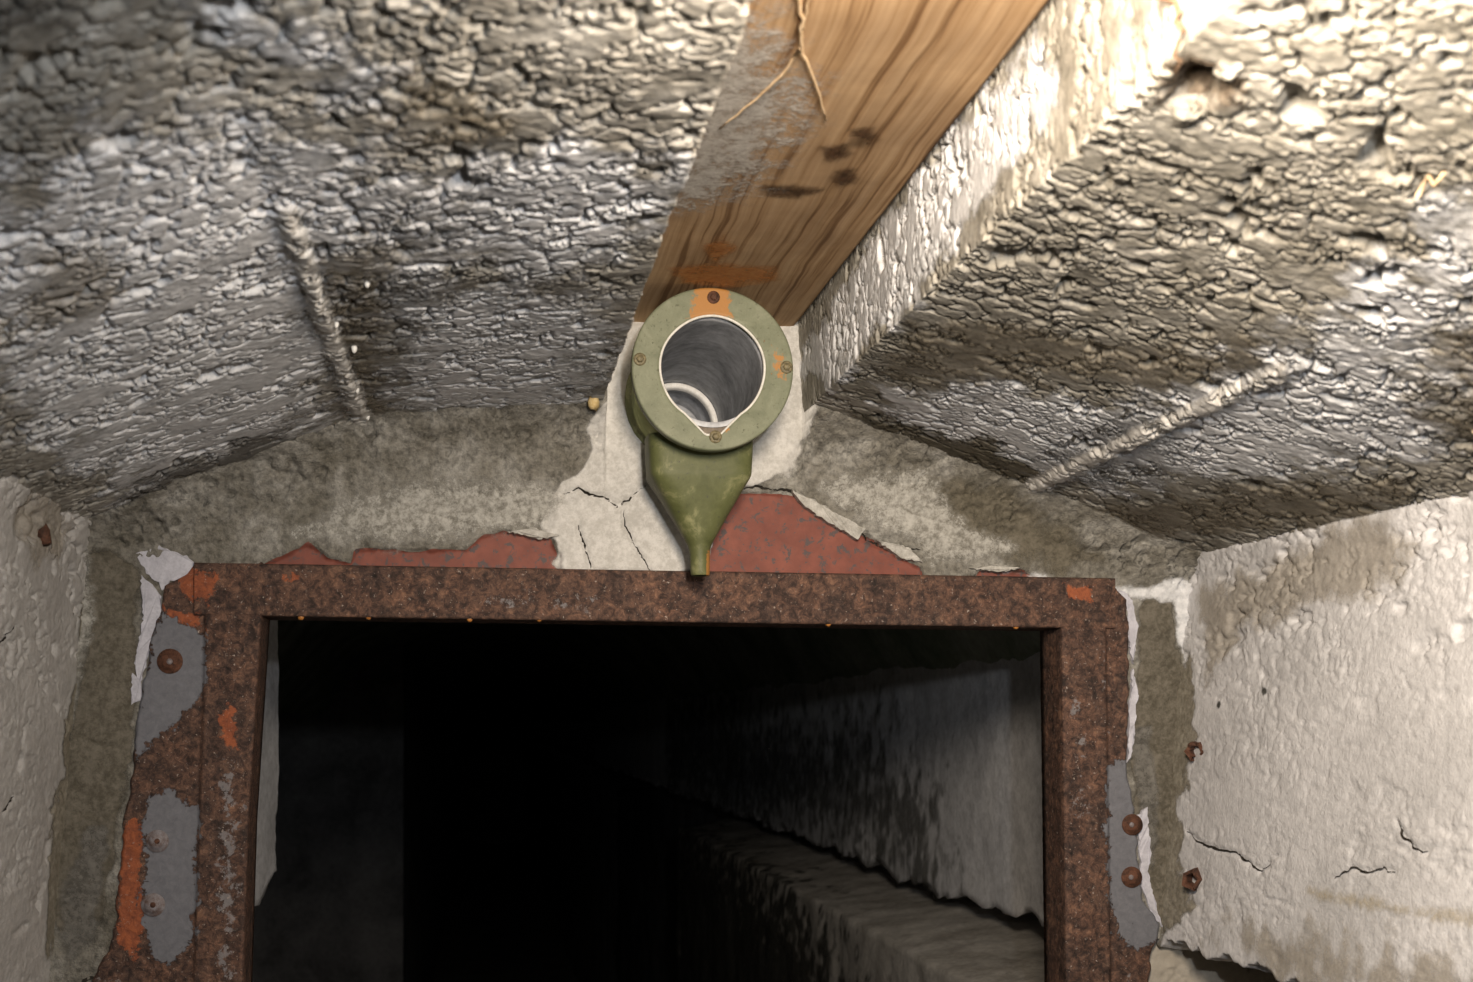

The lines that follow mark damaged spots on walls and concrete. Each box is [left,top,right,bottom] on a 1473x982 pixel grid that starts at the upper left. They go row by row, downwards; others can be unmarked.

flaking render [265,527,559,569]
crack [567,487,650,570]
flaking render [710,490,923,575]
flaking render [968,564,1034,577]
peeling [131,546,194,705]
crack [1187,831,1271,872]
crack [1335,821,1427,878]